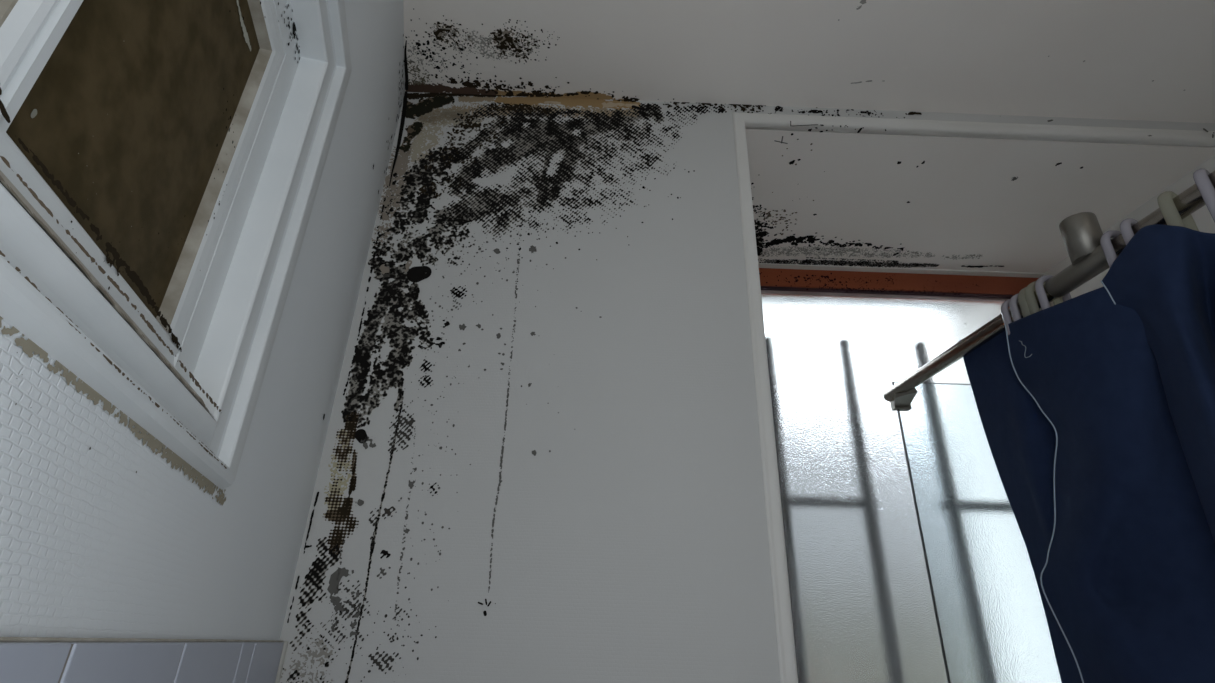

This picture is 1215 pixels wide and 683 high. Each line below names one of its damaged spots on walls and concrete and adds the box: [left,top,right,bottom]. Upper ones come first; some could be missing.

damp [281,8,922,683]
peeling [602,102,658,120]